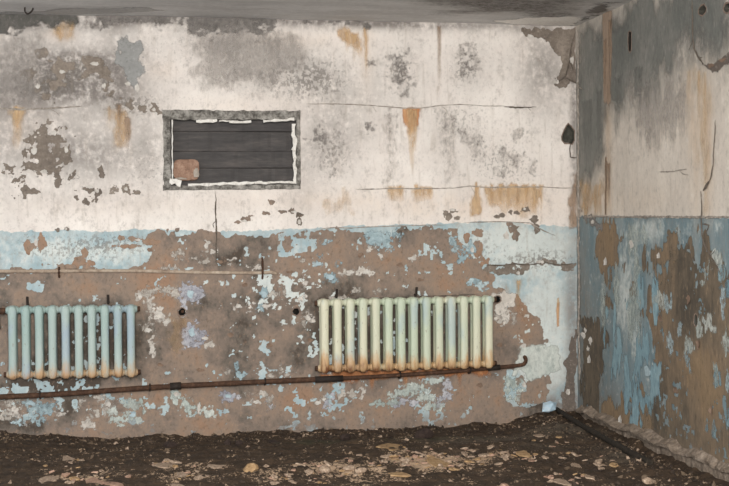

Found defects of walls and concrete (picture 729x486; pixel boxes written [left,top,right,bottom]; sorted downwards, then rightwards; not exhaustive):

damp [0,7,303,82]
peeling [521,27,576,88]
rust [403,107,420,135]
crack [320,103,532,114]
damp [576,0,726,193]
spalling [1,119,78,199]
crack [355,185,567,198]
rust [472,183,542,215]
crack [584,125,729,275]
peeling [0,199,576,439]
rust [321,366,488,383]
peeling [560,214,729,463]